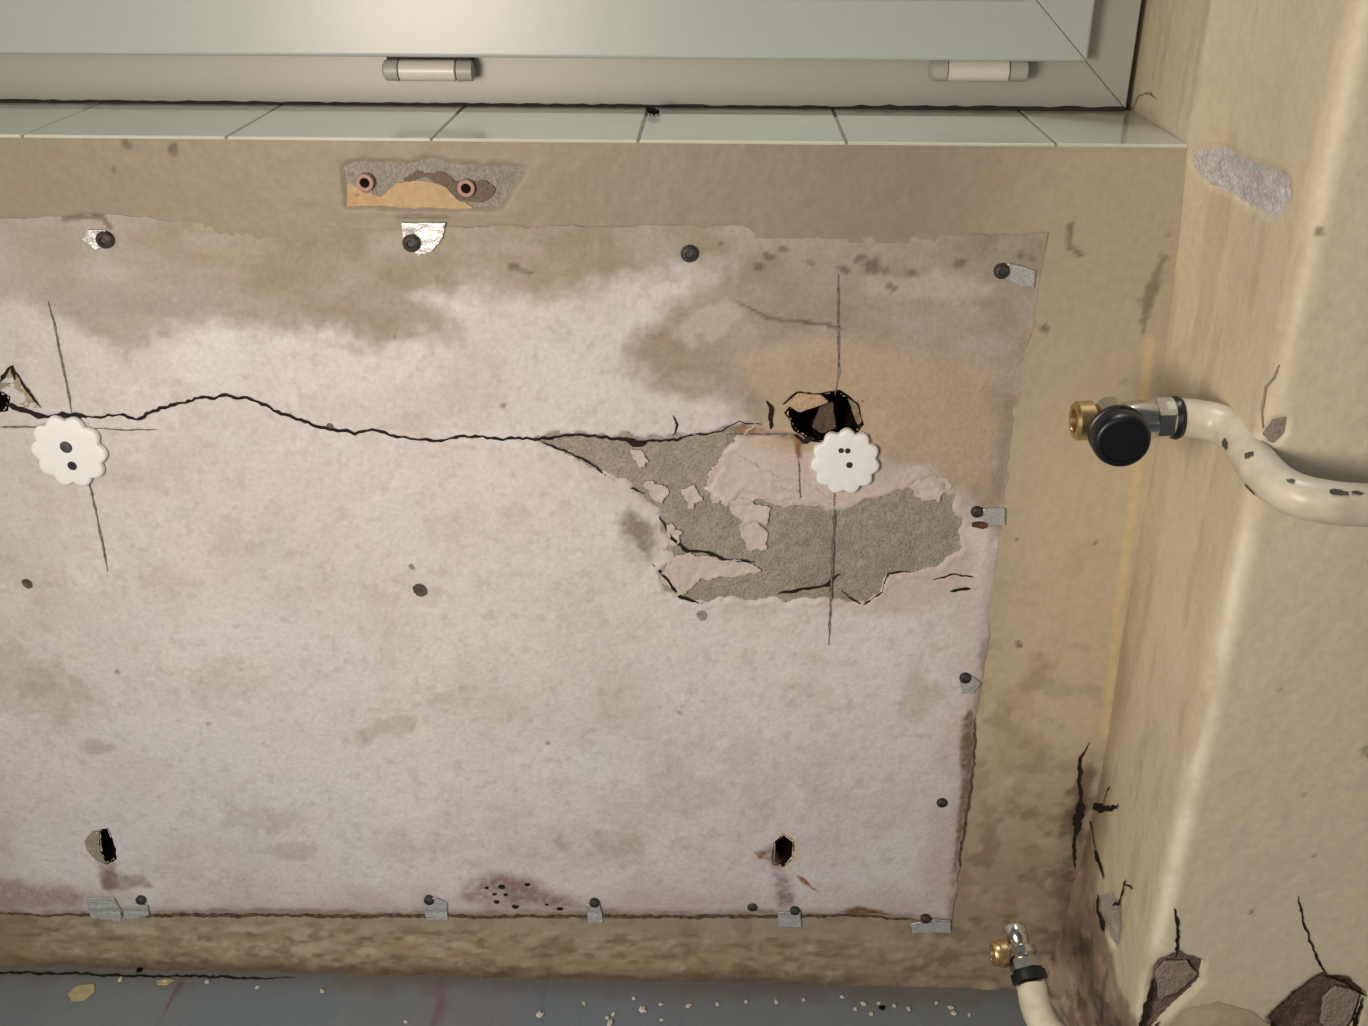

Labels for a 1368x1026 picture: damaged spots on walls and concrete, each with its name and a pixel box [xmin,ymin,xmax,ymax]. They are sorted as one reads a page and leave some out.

flaking render [344,157,524,209]
flaking render [1192,147,1292,218]
crack [5,381,761,447]
flaking render [0,214,1048,922]
crack [1072,742,1118,878]
damp [480,876,563,911]
flaking render [1096,879,1132,946]
flaking render [1138,908,1201,1026]
flaking render [1269,896,1366,1026]